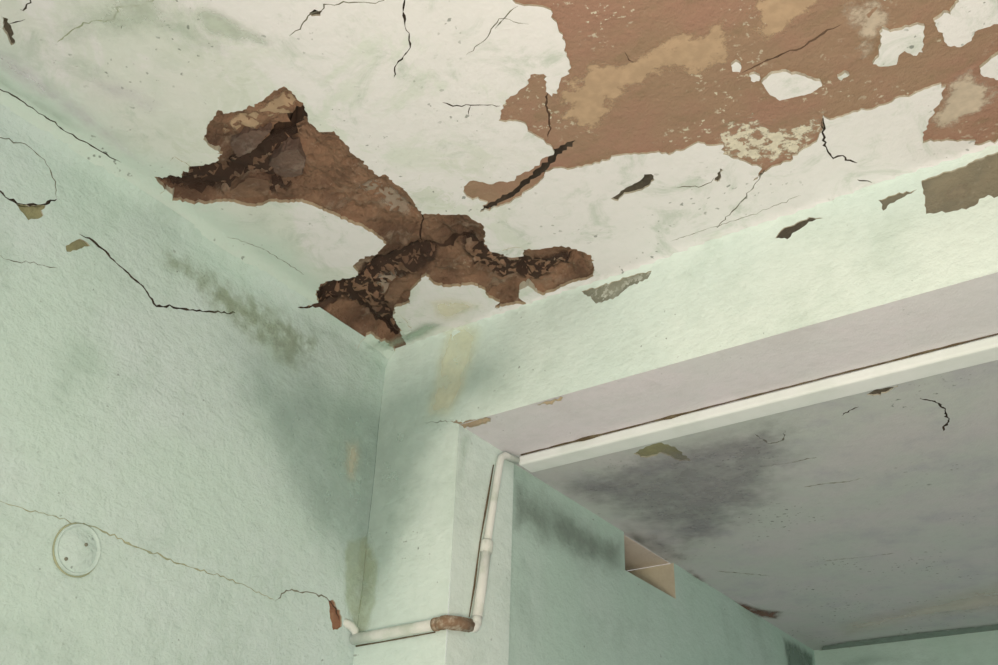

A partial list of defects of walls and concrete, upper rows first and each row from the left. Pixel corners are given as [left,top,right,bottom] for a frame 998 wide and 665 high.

crack [58,0,154,41]
crack [291,0,411,77]
crack [471,6,525,52]
crack [0,137,57,207]
peeling [155,0,998,351]
crack [80,234,235,314]
crack [920,398,950,430]
crack [0,501,340,621]